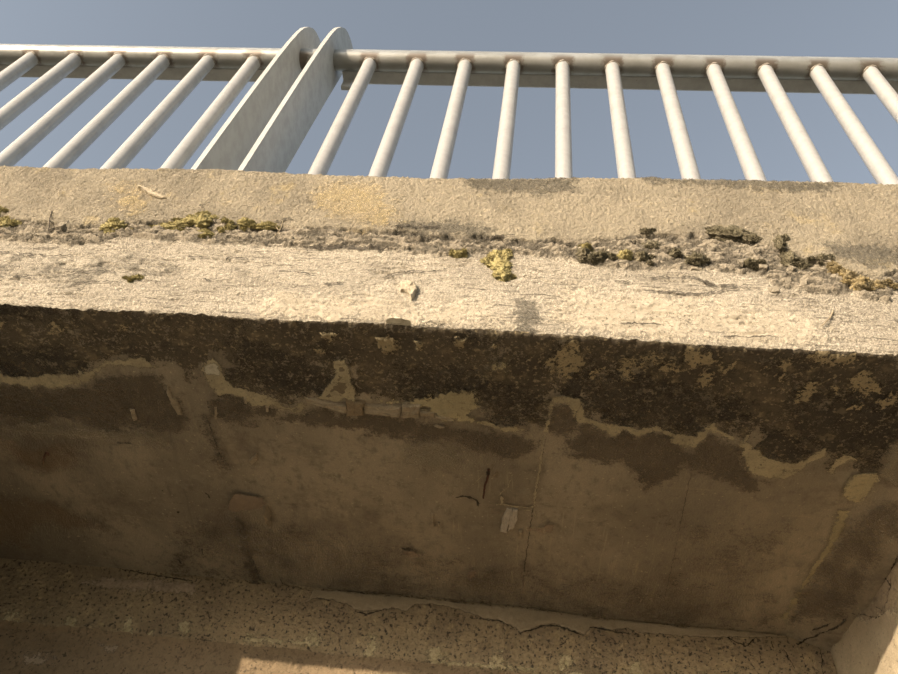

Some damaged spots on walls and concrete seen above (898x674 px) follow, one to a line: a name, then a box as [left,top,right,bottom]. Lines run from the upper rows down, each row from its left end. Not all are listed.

leakage [32,254,179,289]
spalling [768,265,808,293]
leakage [0,298,898,503]
crack [243,523,636,635]
crack [727,556,898,674]